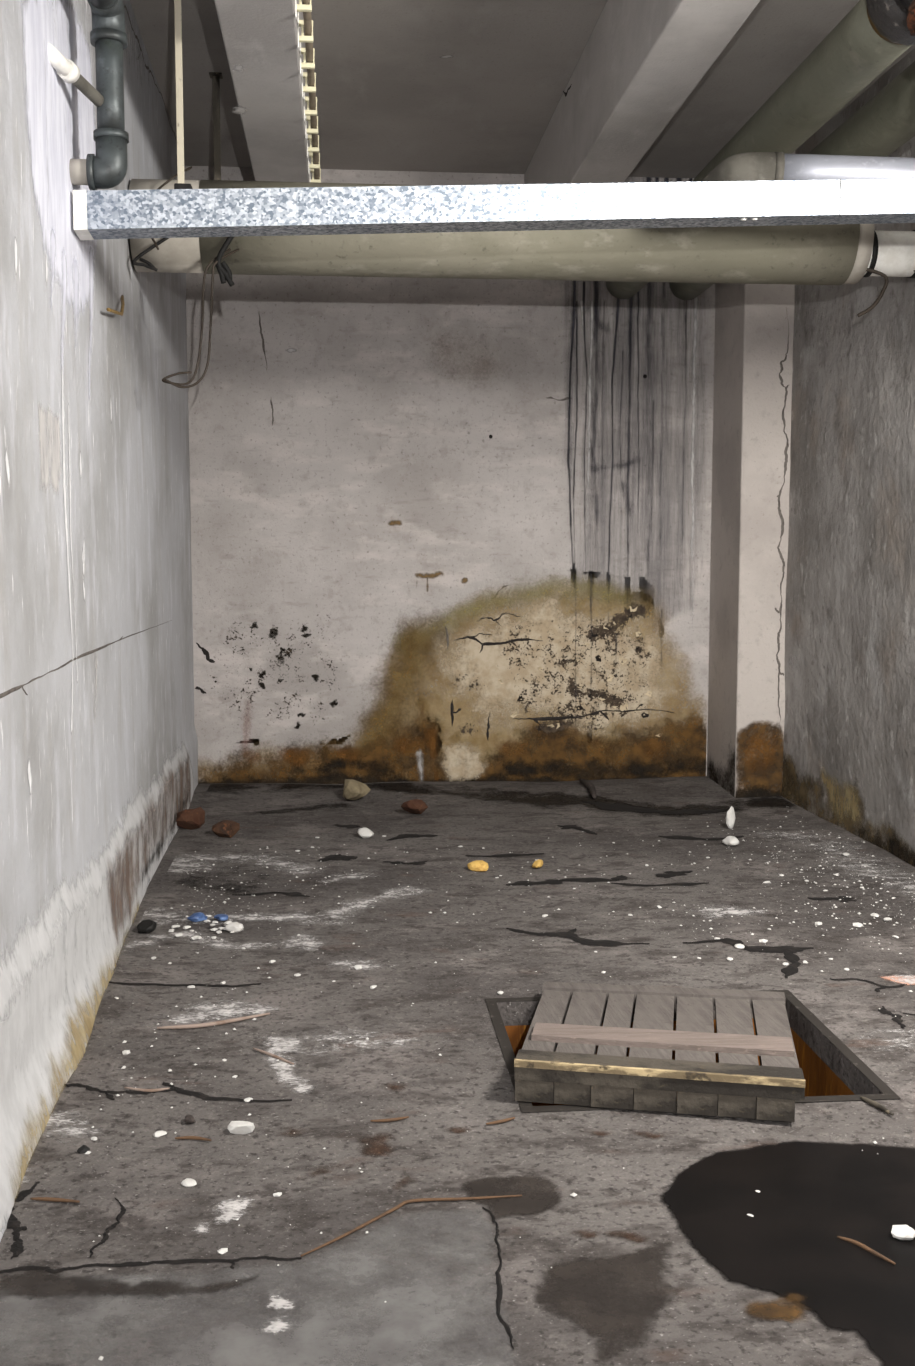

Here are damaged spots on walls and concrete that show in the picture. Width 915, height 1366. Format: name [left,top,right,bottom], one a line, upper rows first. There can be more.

crack [775,309,789,732]
crack [0,620,172,698]
crack [195,643,215,694]
crack [445,585,541,652]
damp [0,281,915,1229]
crack [450,700,674,740]
crack [506,928,915,1028]
crack [63,1082,292,1102]
crack [0,1181,302,1274]
damp [0,1269,253,1297]
crack [482,1207,514,1349]
damp [536,1244,669,1360]